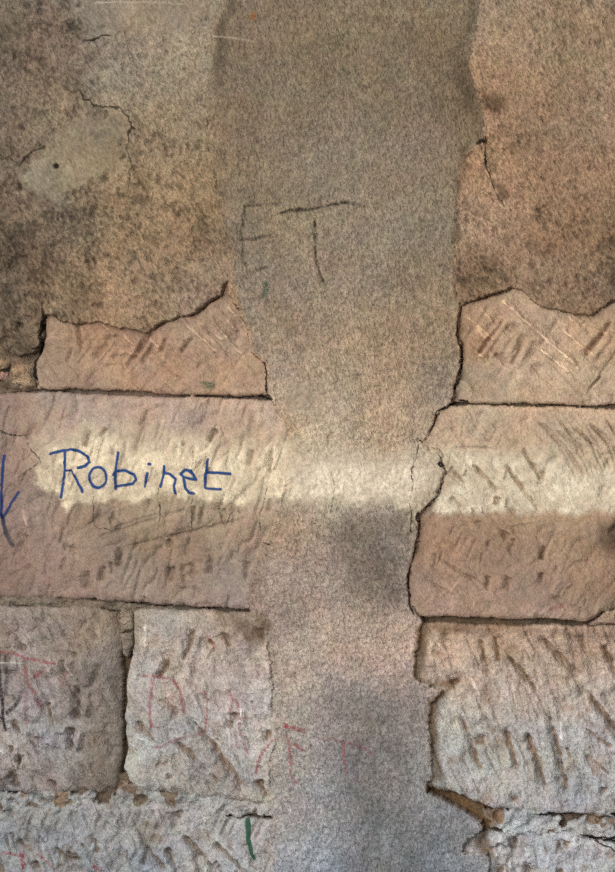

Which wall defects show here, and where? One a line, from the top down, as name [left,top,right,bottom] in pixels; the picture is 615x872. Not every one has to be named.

crack [477,139,503,203]
spalling [0,277,270,397]
spalling [453,284,615,407]